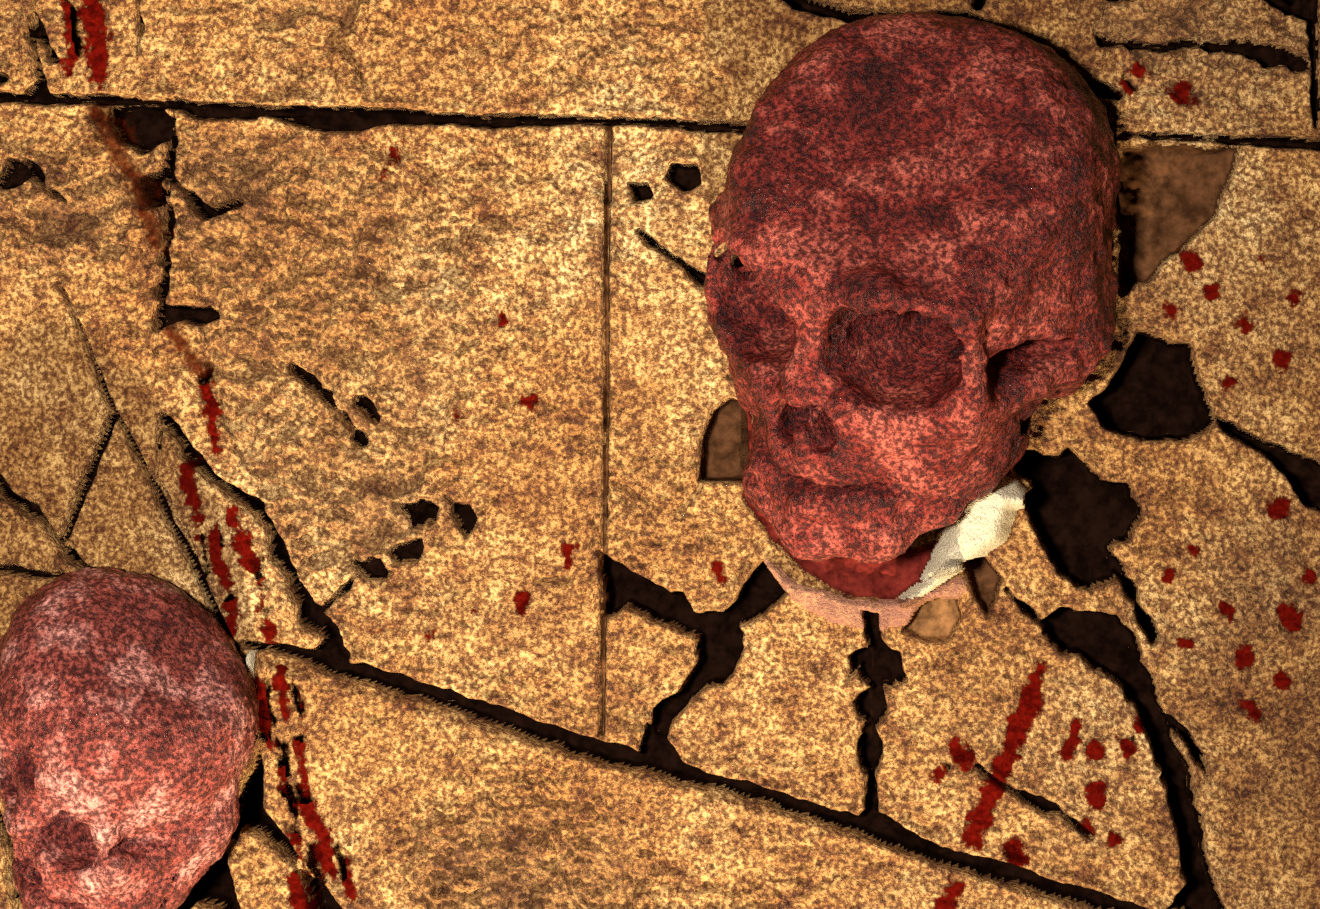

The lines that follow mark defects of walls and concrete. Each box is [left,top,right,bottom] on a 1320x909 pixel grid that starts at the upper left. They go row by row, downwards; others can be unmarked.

crack [28,12,59,63]
crack [784,0,891,23]
crack [938,0,985,20]
crack [1088,82,1122,100]
crack [1125,0,1320,150]
crack [0,69,747,555]
crack [0,314,240,652]
crack [1217,418,1320,509]
crack [161,415,1148,909]
crack [1021,546,1224,909]